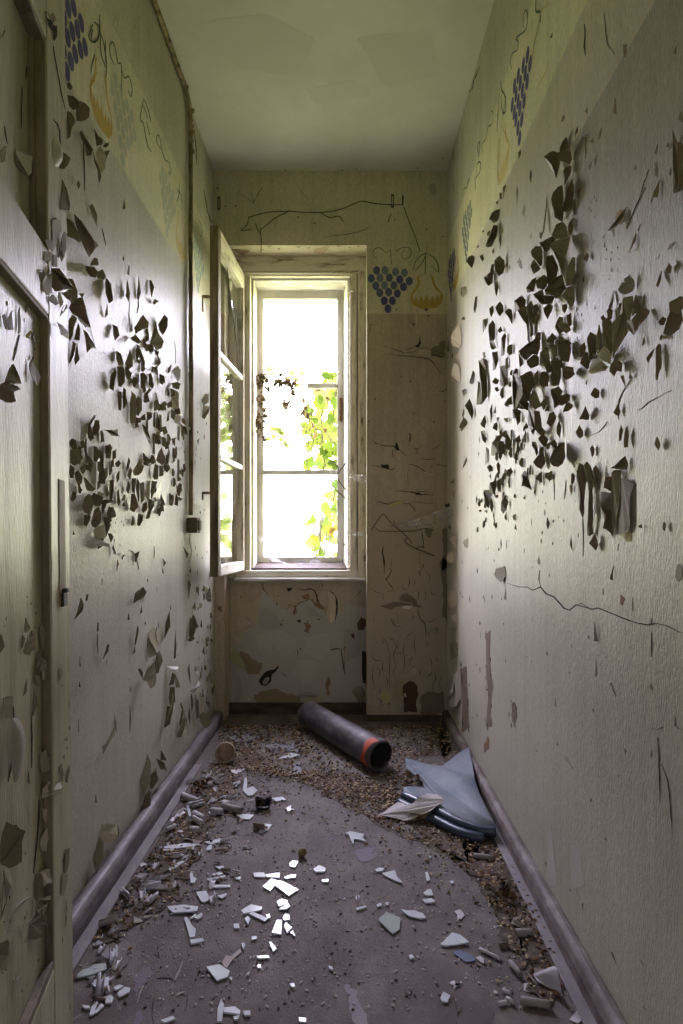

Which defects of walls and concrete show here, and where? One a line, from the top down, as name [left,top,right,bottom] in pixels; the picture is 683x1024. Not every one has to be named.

peeling [67,82,110,183]
peeling [634,111,683,203]
peeling [0,301,41,403]
peeling [38,152,209,569]
peeling [446,127,683,564]
peeling [128,546,215,739]
flaking render [230,587,366,703]
flaking render [402,681,418,712]
flaking render [447,589,493,733]
crack [508,570,682,657]
peeling [140,750,167,810]
peeling [0,822,26,924]